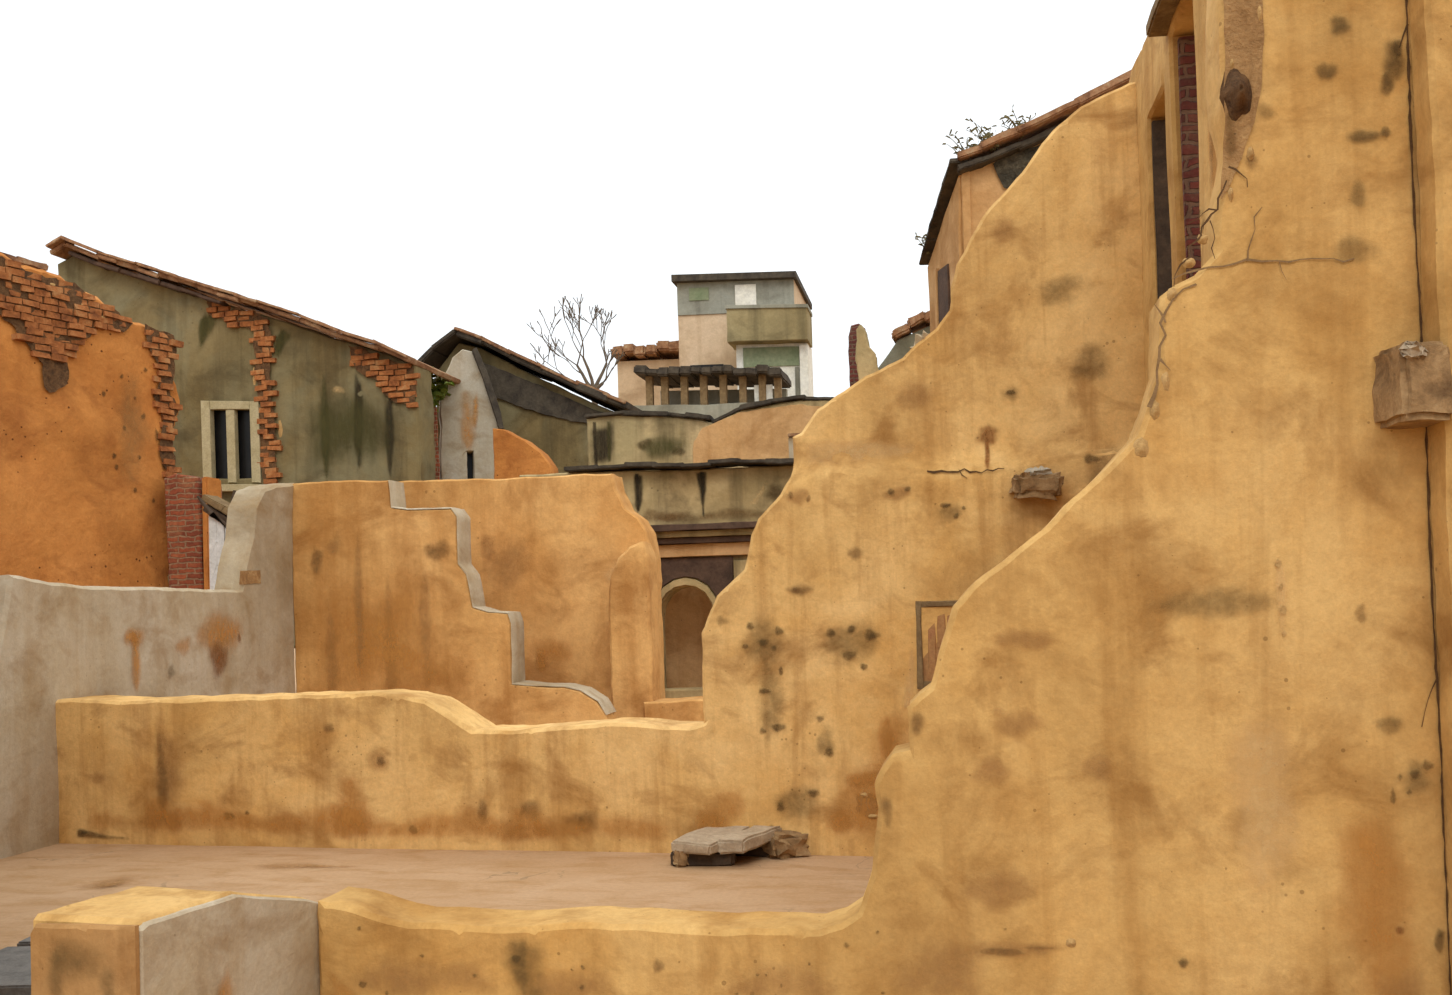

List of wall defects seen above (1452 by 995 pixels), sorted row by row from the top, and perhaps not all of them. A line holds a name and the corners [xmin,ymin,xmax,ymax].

crack [1400,0,1423,342]
flaking render [0,256,184,477]
flaking render [206,301,283,484]
flaking render [349,346,420,408]
crack [927,468,1004,478]
crack [1133,133,1354,458]
crack [1421,427,1452,995]